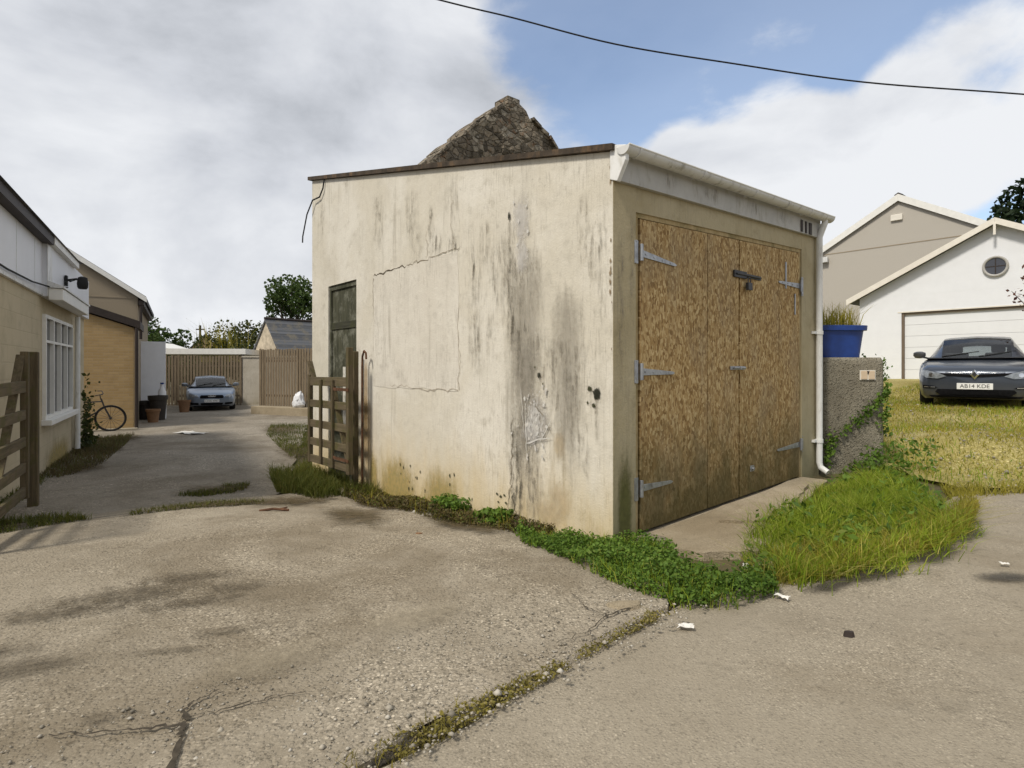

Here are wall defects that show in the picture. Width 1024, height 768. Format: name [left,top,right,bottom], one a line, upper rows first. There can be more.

crack [372,196,460,350]
crack [390,308,461,392]
peeling [511,385,551,460]
damp [383,465,410,497]
damp [430,479,454,502]